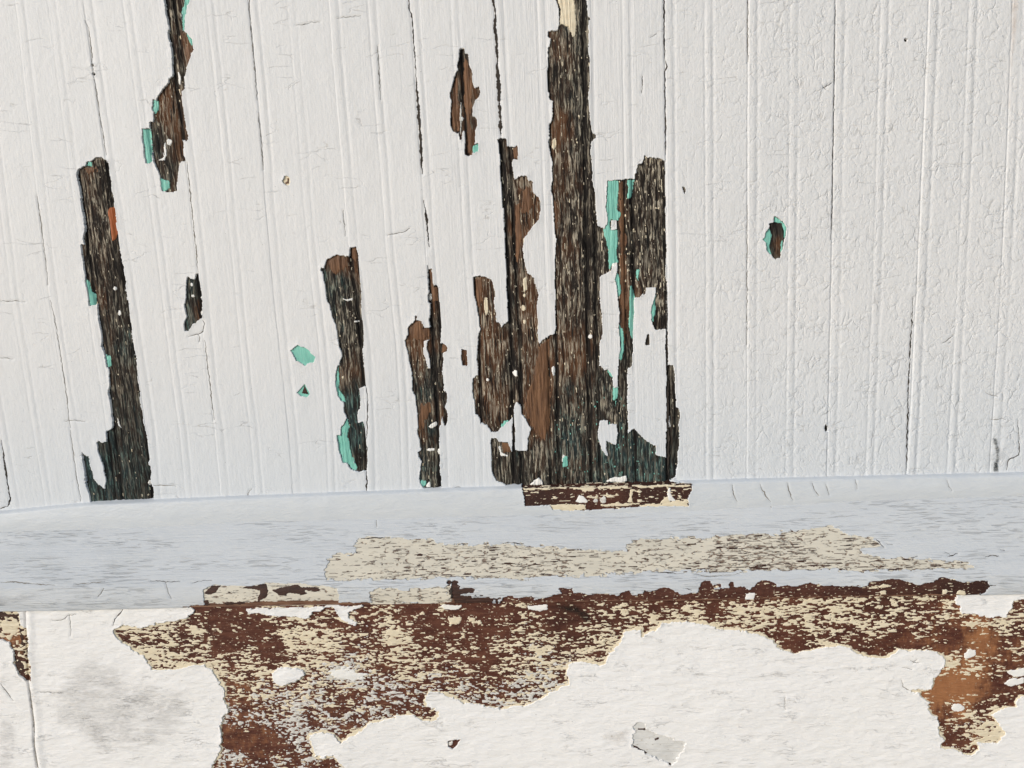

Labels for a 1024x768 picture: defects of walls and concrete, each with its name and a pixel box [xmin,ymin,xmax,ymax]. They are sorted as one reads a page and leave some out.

peeling [143,0,194,193]
peeling [450,49,480,156]
peeling [78,157,154,501]
peeling [184,273,203,331]
peeling [291,345,315,366]
peeling [321,247,368,472]
peeling [405,268,448,488]
peeling [461,0,692,511]
peeling [763,216,786,260]
peeling [0,611,31,681]
peeling [113,525,1024,768]